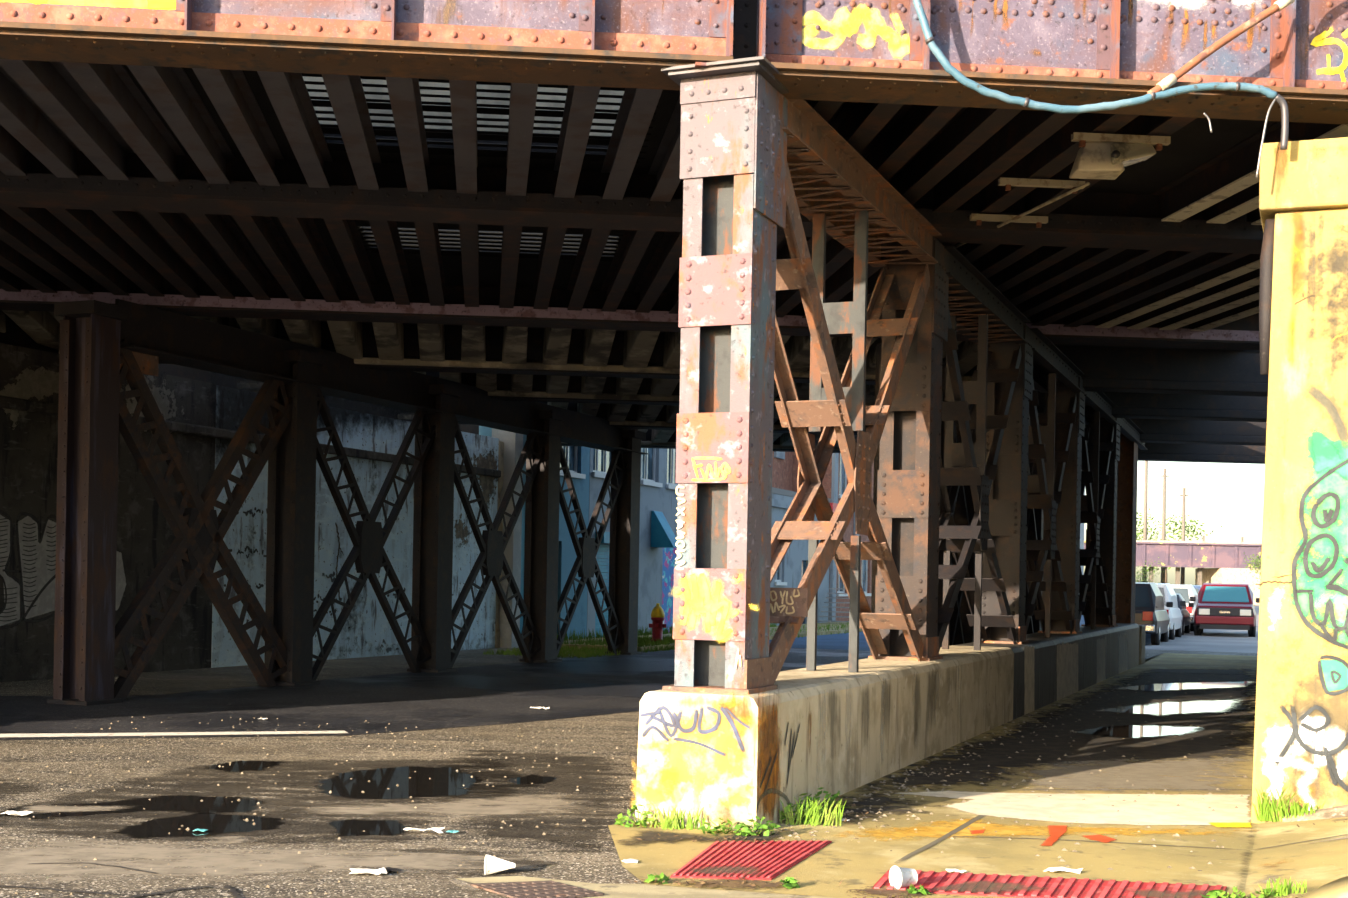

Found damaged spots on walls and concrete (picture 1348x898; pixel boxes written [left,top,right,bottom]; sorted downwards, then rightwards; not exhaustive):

corrosion [994,0,1008,23]
corrosion [1169,0,1216,50]
corrosion [1247,1,1260,48]
leakage [1302,226,1348,358]
leakage [1024,646,1035,715]
leakage [1057,642,1078,701]